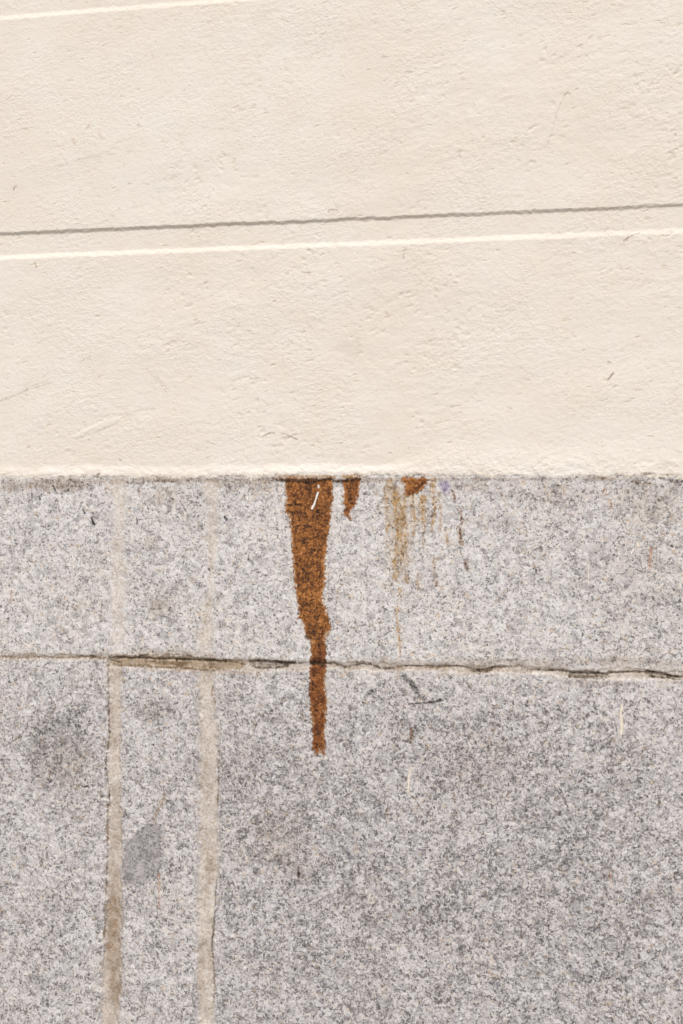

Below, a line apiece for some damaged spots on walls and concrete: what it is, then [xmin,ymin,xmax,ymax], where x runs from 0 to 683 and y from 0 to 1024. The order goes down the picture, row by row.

corrosion [272,474,361,757]
crack [2,653,244,704]
crack [295,661,403,670]
crack [428,664,571,672]